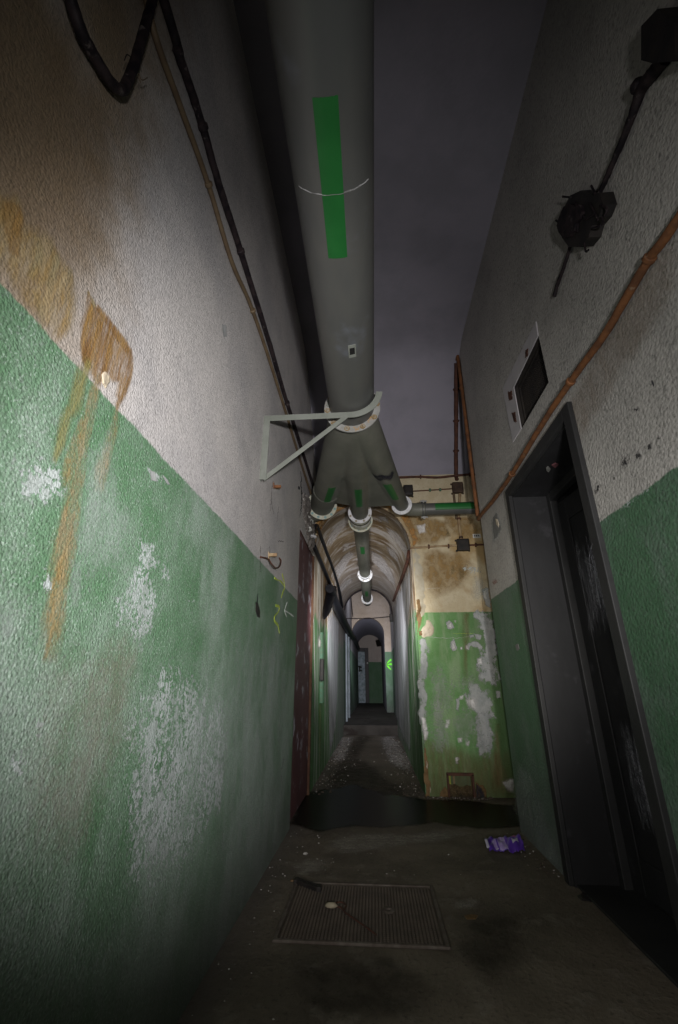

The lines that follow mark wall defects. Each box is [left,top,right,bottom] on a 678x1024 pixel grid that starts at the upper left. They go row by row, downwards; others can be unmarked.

corrosion [54,299,133,477]
corrosion [45,509,75,657]
damp [371,506,478,591]
peeling [446,588,501,755]